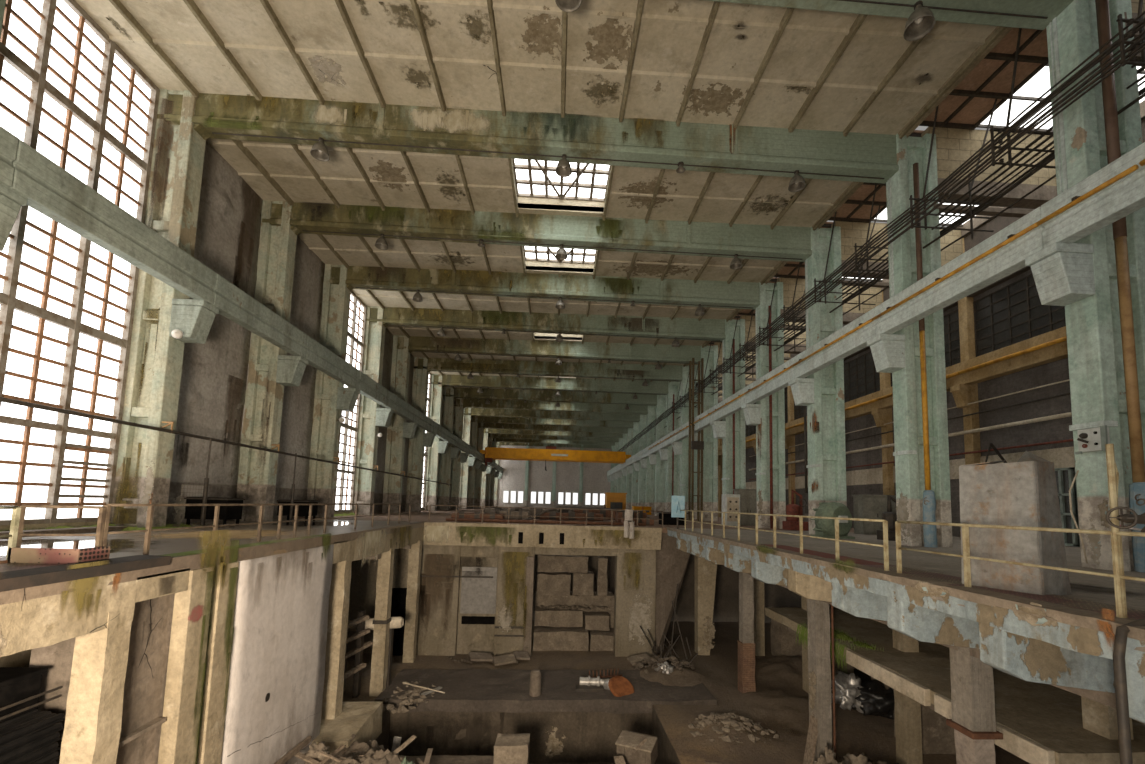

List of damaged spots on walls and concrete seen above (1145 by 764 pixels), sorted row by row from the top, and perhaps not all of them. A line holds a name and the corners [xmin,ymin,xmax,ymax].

peeling [519,5,562,62]
peeling [583,13,634,105]
leakage [315,101,377,123]
leakage [410,109,488,133]
leakage [535,112,589,137]
peeling [681,83,755,117]
peeling [368,157,415,192]
peeling [618,177,677,209]
peeling [1012,602,1058,627]
leakage [225,609,234,708]
leakage [194,615,211,764]